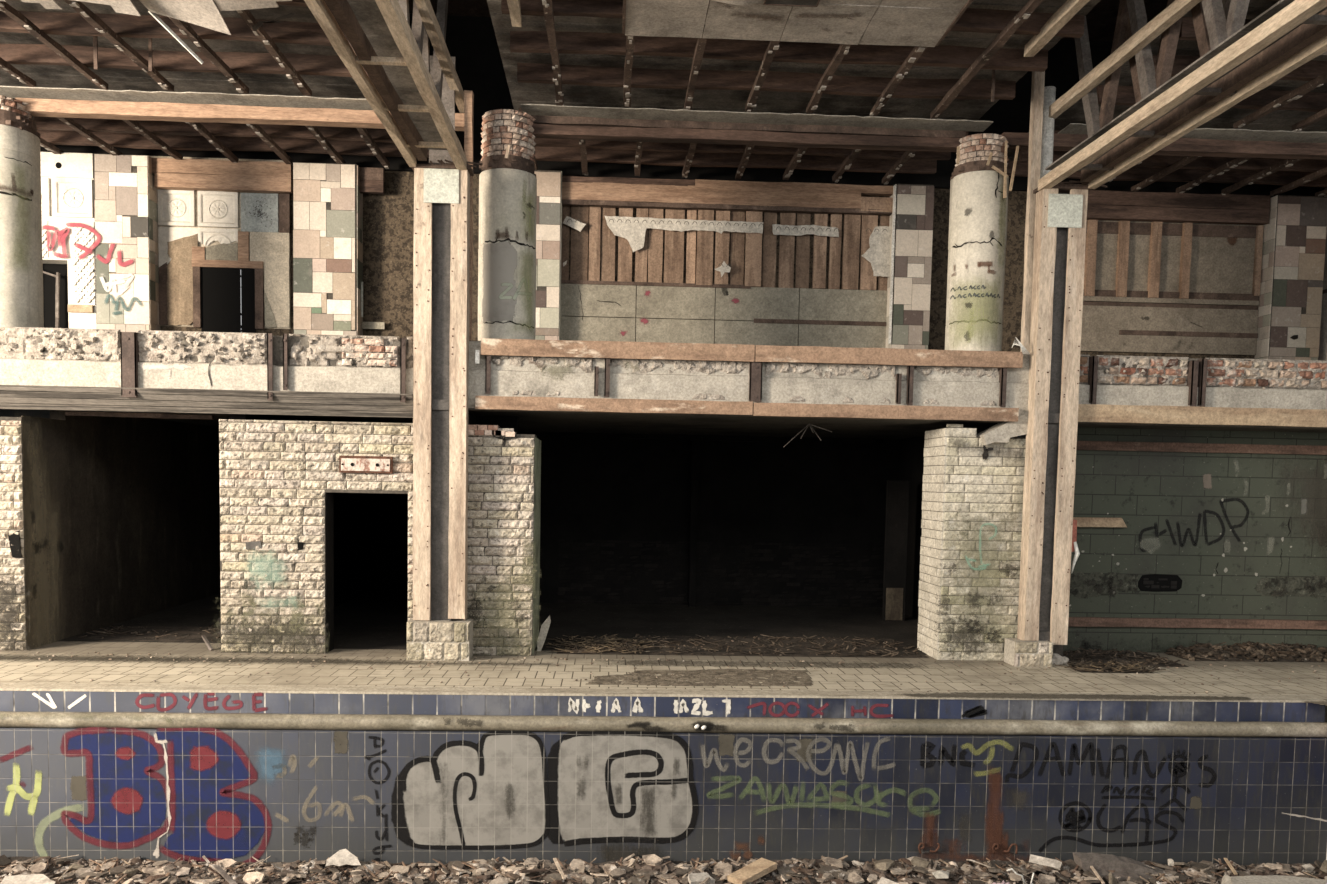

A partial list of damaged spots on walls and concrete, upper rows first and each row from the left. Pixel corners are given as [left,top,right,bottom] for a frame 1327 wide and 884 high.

crack [0,157,32,201]
crack [953,238,1002,248]
damp [0,431,483,665]
damp [999,561,1017,578]
damp [934,590,1004,655]
damp [618,660,913,668]